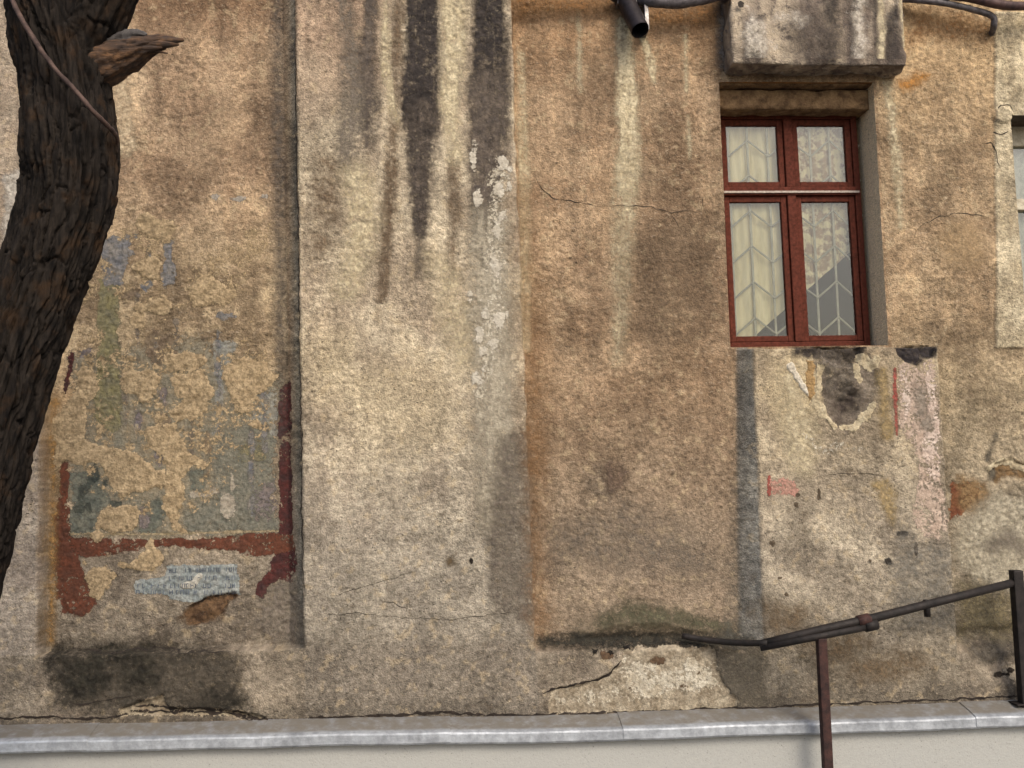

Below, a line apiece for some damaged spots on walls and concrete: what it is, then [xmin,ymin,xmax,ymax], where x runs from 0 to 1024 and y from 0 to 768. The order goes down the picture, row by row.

water stain [311,0,531,368]
crack [536,179,709,225]
water stain [488,432,537,621]
spalling [767,353,881,508]
peeling [892,359,1024,591]
water stain [44,643,245,716]
spalling [181,593,238,625]
spalling [543,644,739,715]